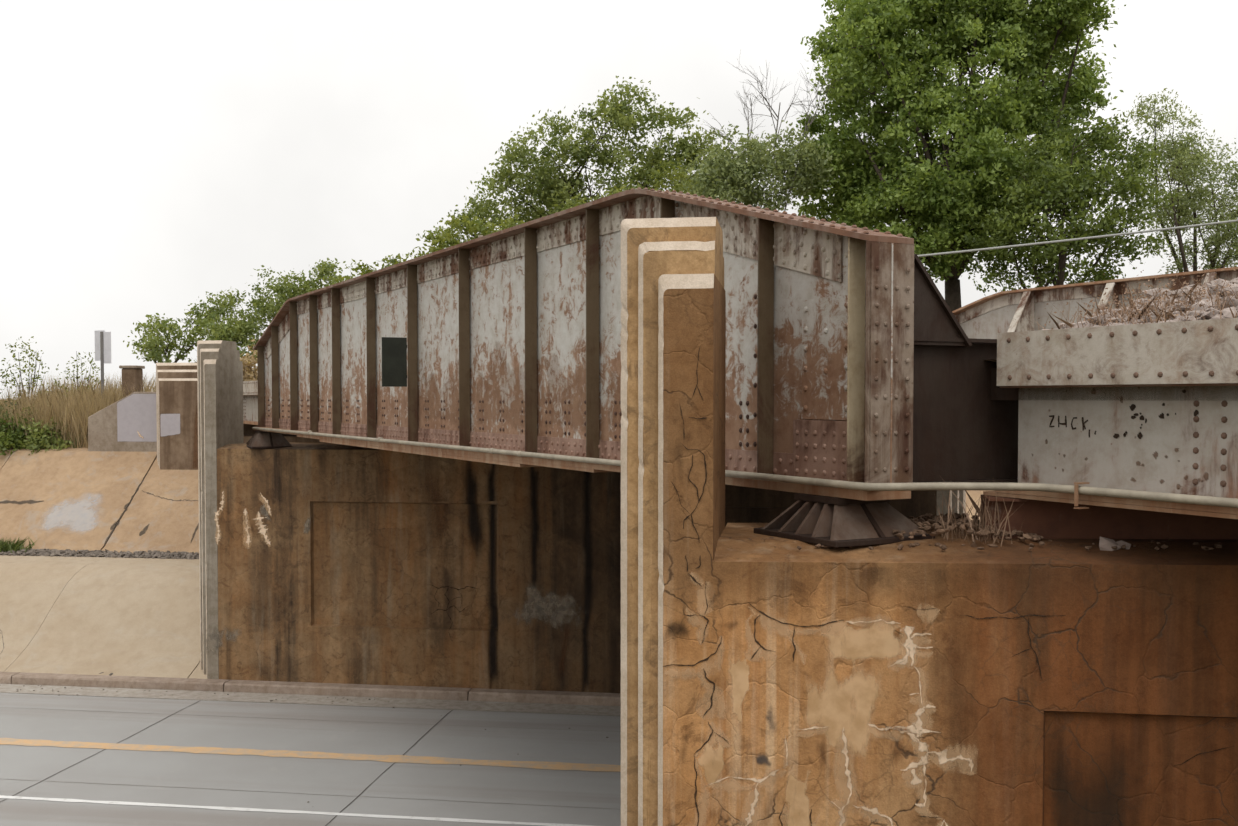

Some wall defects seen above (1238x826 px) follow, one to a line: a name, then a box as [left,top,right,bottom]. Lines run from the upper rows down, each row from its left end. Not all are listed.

leakage [243,493,271,547]
leakage [466,464,498,680]
leakage [583,472,592,689]
crack [663,348,727,826]
crack [748,602,846,661]